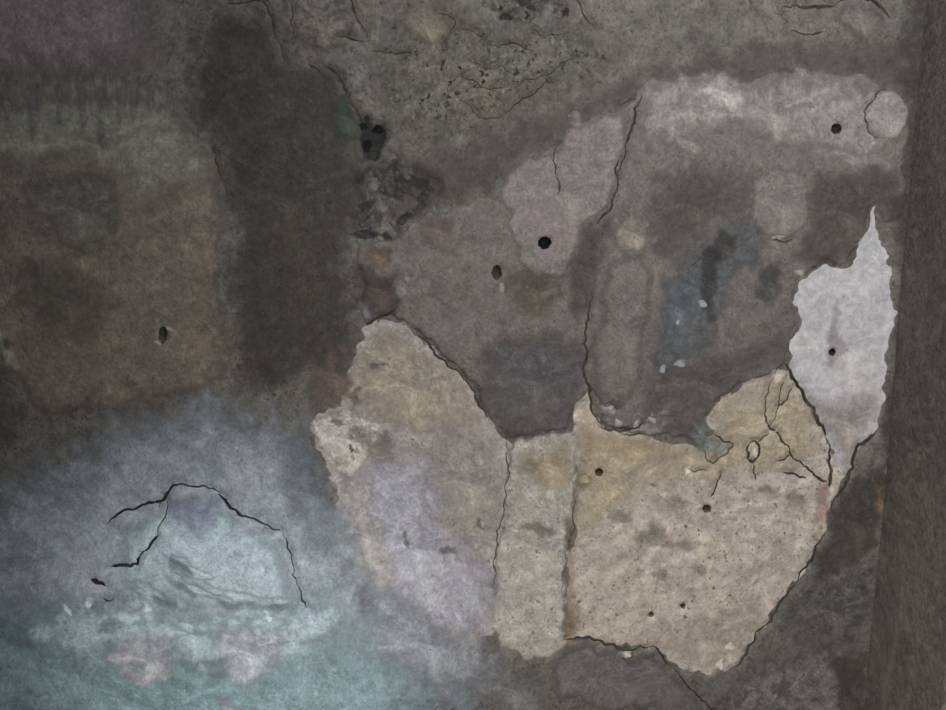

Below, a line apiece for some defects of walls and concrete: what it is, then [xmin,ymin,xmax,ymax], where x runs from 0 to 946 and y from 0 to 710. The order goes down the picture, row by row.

crack [228,0,294,59]
crack [308,63,363,123]
crack [335,0,412,55]
crack [437,11,575,120]
crack [781,0,843,36]
crack [866,0,891,19]
crack [597,94,642,224]
flaking render [310,0,910,710]
crack [582,291,644,436]
crack [90,483,307,608]
crack [689,363,876,670]
crack [565,636,716,710]